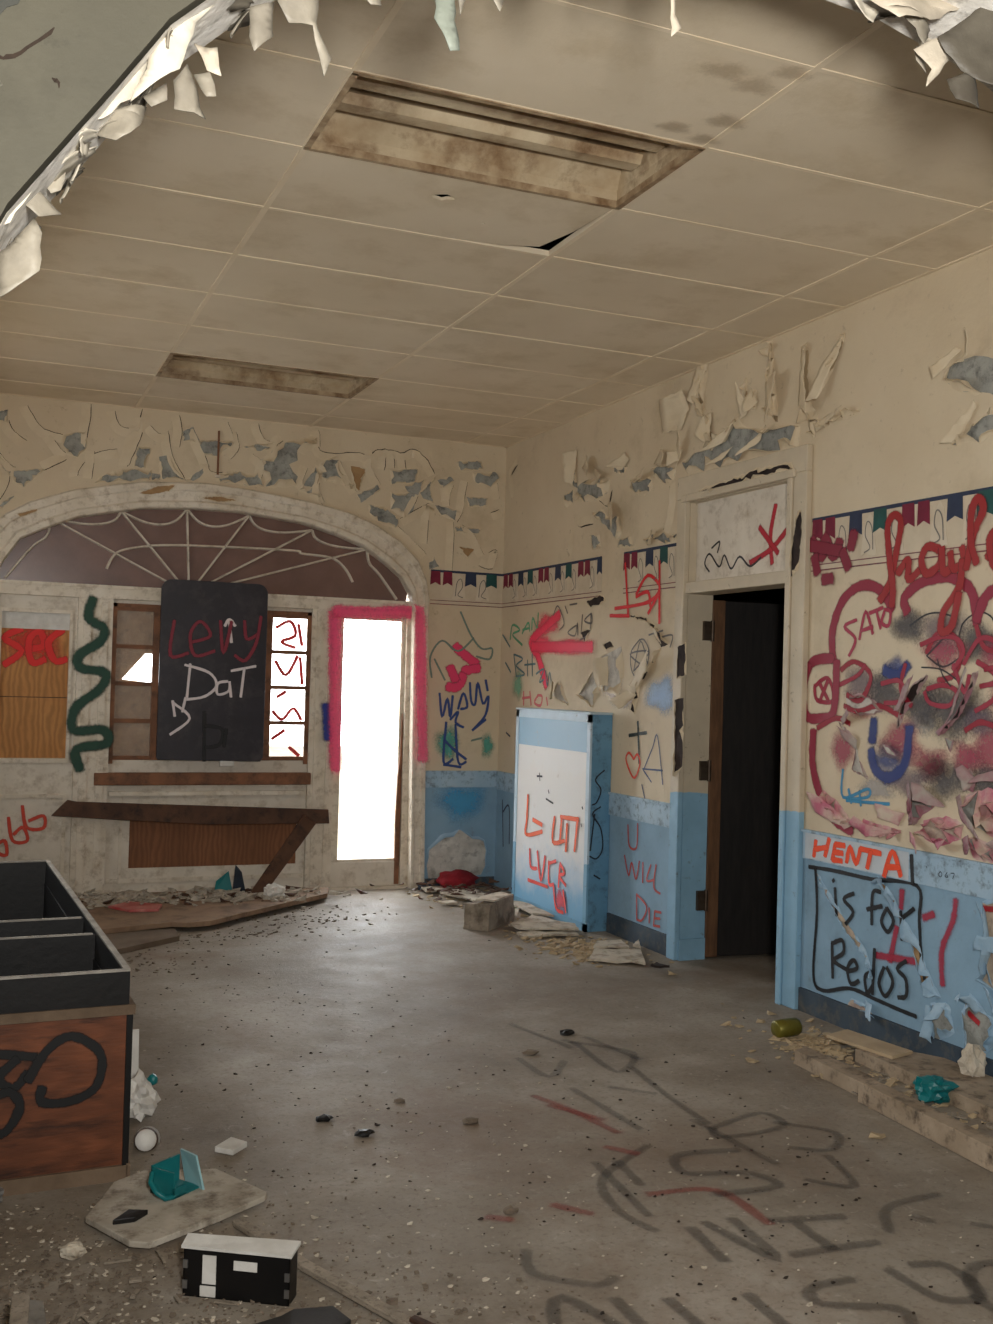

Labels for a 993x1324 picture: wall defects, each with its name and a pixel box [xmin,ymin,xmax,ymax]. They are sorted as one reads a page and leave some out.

peeling [434,0,465,51]
peeling [670,0,682,37]
peeling [854,0,993,109]
peeling [0,0,332,297]
peeling [95,427,501,558]
peeling [562,332,861,550]
peeling [789,510,802,578]
peeling [929,329,993,446]
peeling [549,615,687,715]
peeling [672,697,684,777]
peeling [806,765,993,863]
peeling [871,876,993,1054]